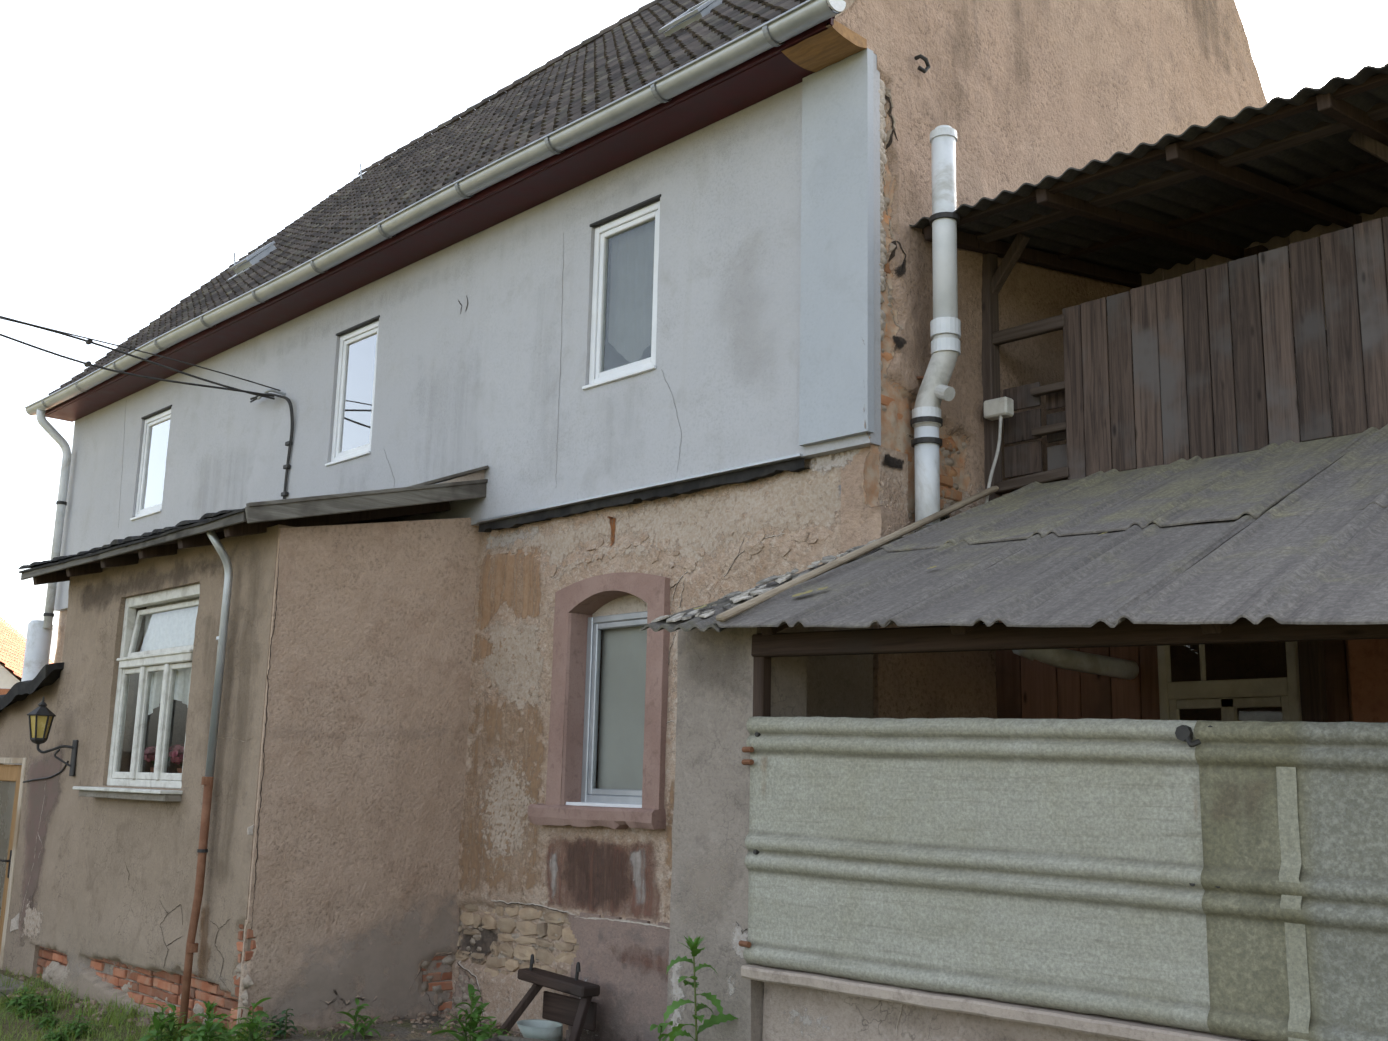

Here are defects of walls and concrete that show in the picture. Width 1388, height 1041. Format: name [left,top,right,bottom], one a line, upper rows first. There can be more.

peeling [486,78,917,581]
spalling [939,426,986,515]
peeling [669,607,682,754]
crack [160,548,280,991]
peeling [457,617,545,895]
damp [547,840,659,918]
peeling [666,782,674,910]
flaking render [88,924,263,1035]
spalling [421,954,482,1015]